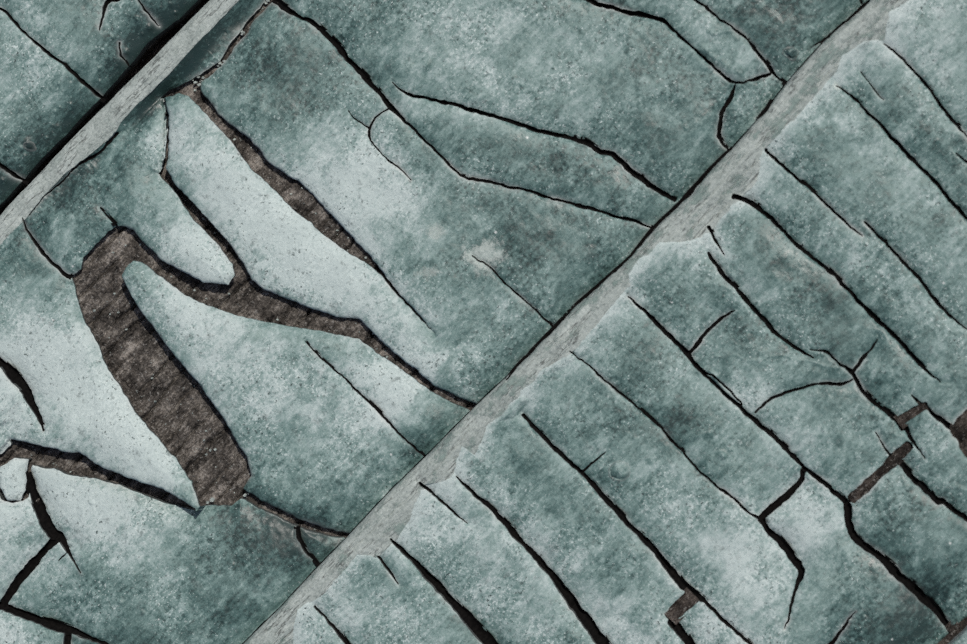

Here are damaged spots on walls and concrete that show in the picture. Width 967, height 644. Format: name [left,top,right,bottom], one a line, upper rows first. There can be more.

crack [0,7,107,103]
crack [0,133,118,280]
peeling [0,0,485,644]
crack [270,0,787,380]
crack [765,148,967,330]
crack [836,72,967,221]
crack [883,43,967,163]
crack [570,194,967,634]
crack [0,472,109,644]
crack [377,539,499,644]
crack [456,476,612,644]
crack [521,413,753,644]